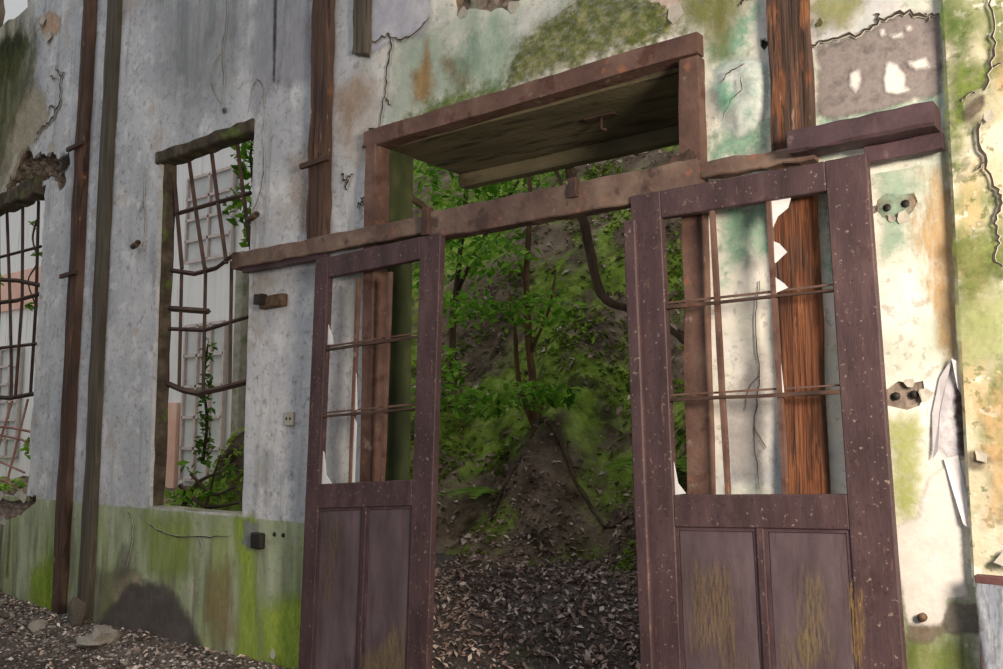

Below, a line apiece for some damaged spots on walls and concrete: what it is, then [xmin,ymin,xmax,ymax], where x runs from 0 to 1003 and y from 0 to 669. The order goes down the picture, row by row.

water stain [0,31,30,123]
crack [362,17,430,149]
flaking render [458,0,520,18]
crack [812,8,940,47]
peeling [817,14,944,120]
crack [961,0,1001,102]
flaking render [0,83,70,193]
crack [341,172,364,208]
crack [975,121,1003,266]
corrosion [919,172,956,341]
peeling [886,358,987,529]
water stain [100,572,201,647]